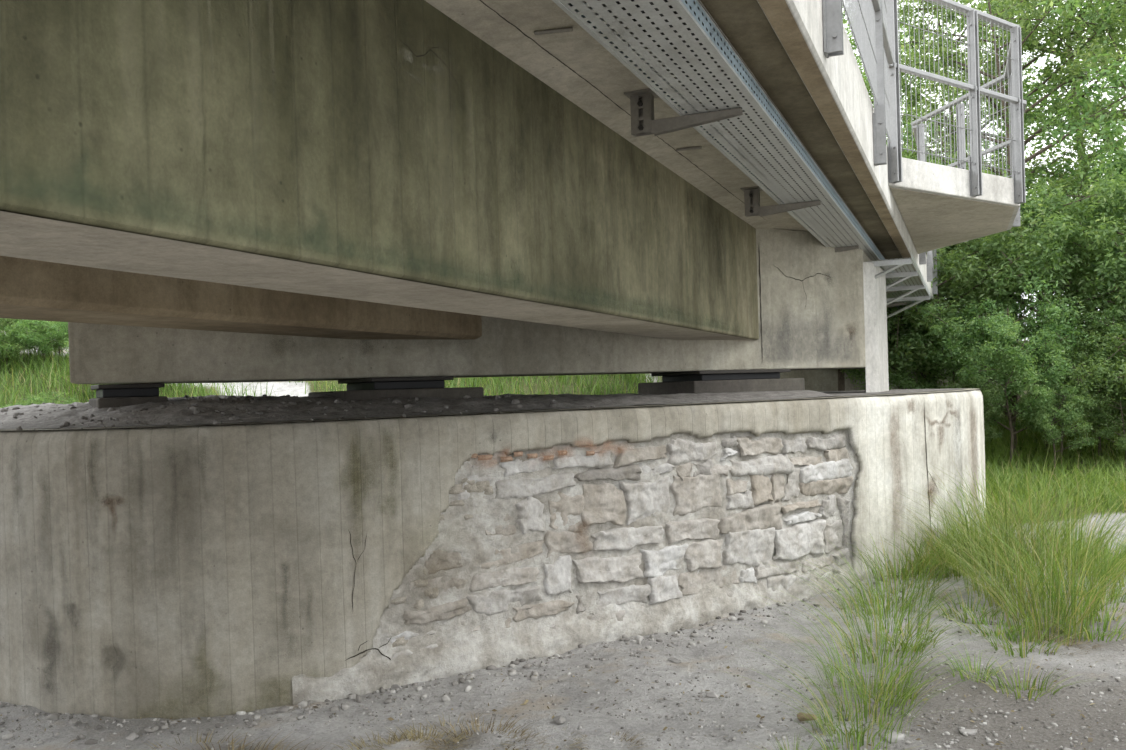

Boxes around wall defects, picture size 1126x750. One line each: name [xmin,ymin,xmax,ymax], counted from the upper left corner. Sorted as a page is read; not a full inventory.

crack [759,251,831,357]
crack [349,532,367,608]
spalling [292,430,880,705]
crack [345,638,391,661]